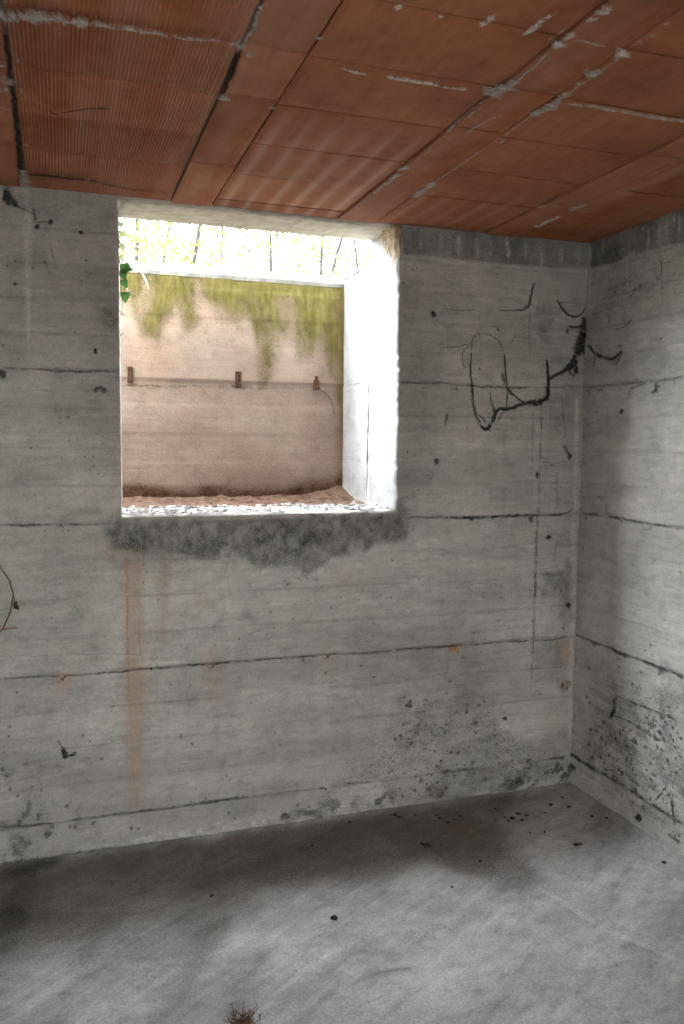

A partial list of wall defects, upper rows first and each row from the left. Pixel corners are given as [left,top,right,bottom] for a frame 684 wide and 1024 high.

crack [3,33,147,192]
crack [222,54,242,94]
crack [501,284,535,312]
crack [401,301,683,466]
water stain [0,395,684,998]